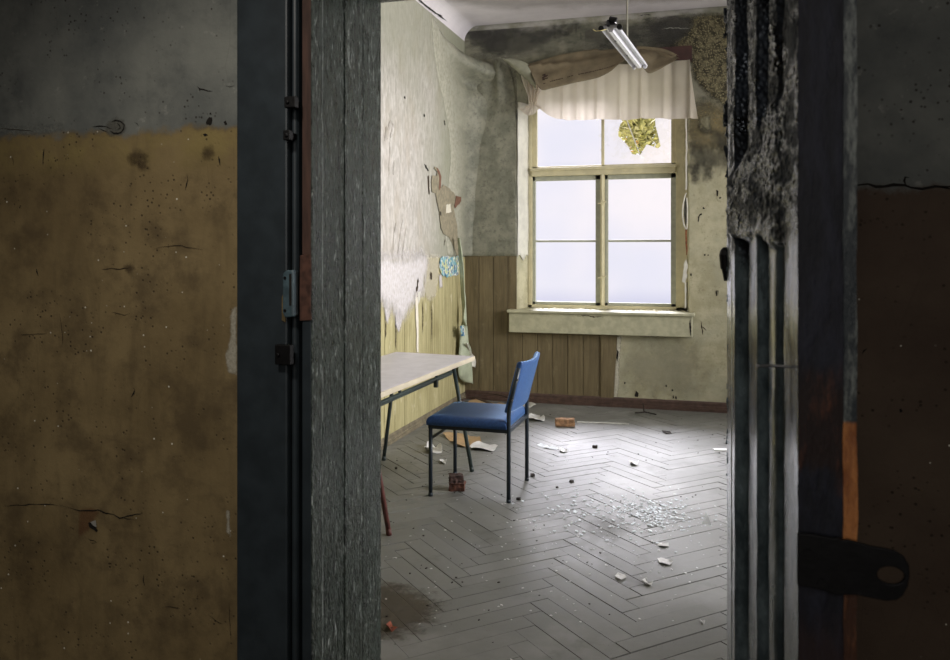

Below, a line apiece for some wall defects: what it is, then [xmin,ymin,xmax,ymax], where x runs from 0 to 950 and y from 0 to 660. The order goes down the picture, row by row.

crack [857,177,950,190]
peeling [381,253,442,353]
peeling [226,307,237,373]
flaking render [614,336,626,397]
crack [10,504,142,520]